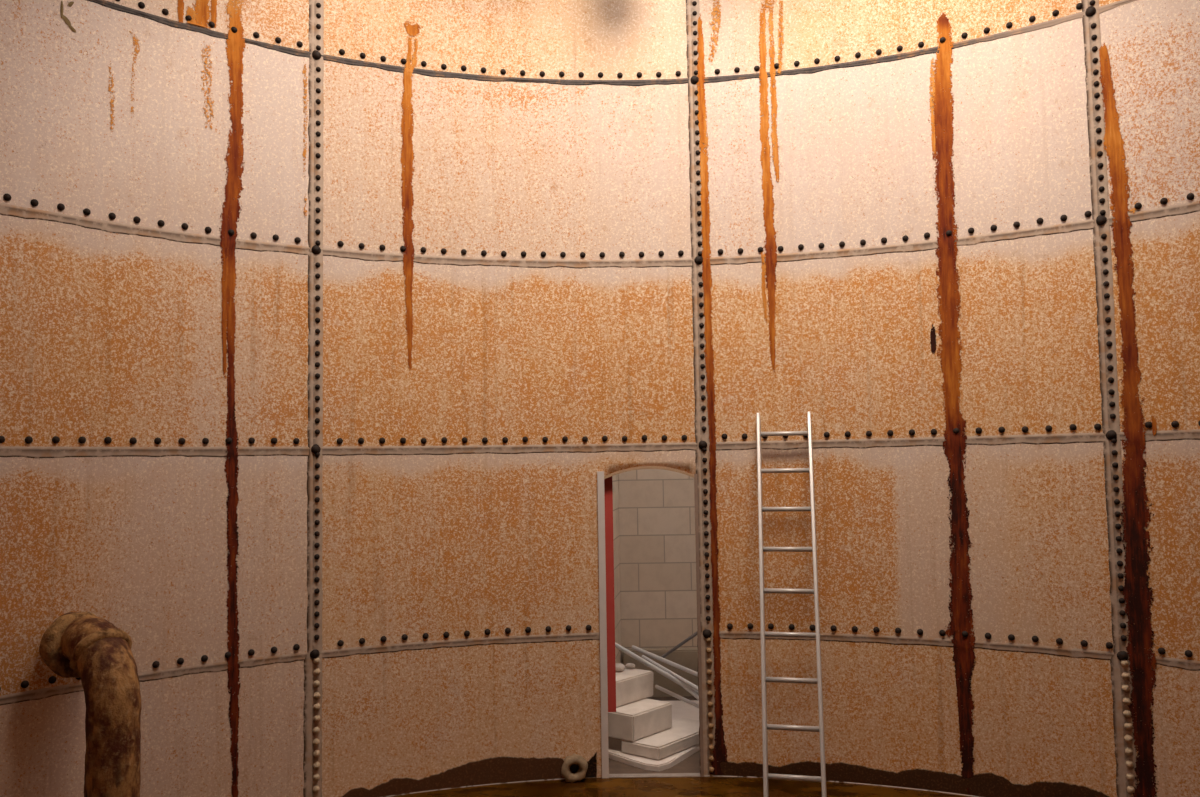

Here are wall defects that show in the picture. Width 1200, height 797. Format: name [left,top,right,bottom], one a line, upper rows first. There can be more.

rust [108,31,140,129]
rust [177,0,248,797]
rust [400,20,423,371]
rust [697,0,728,775]
rust [759,0,784,372]
rust [928,12,976,794]
rust [1099,43,1159,797]